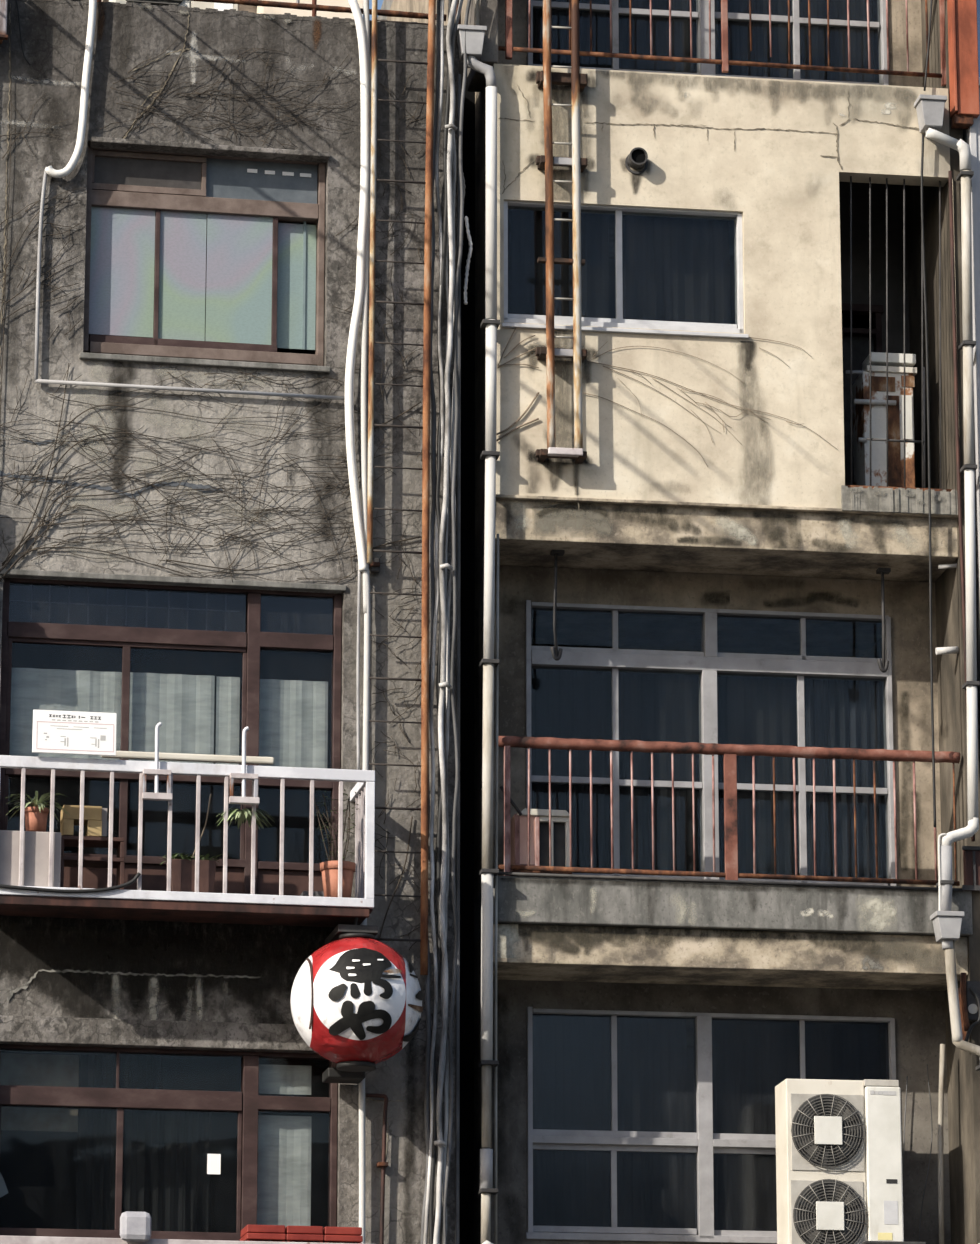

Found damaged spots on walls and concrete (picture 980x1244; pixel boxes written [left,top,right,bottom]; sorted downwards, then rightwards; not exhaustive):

crack [499,86,533,122]
crack [584,92,919,169]
crack [502,160,535,194]
water stain [742,341,754,381]
water stain [113,362,133,497]
water stain [535,503,740,545]
water stain [748,456,848,551]
water stain [518,924,943,970]